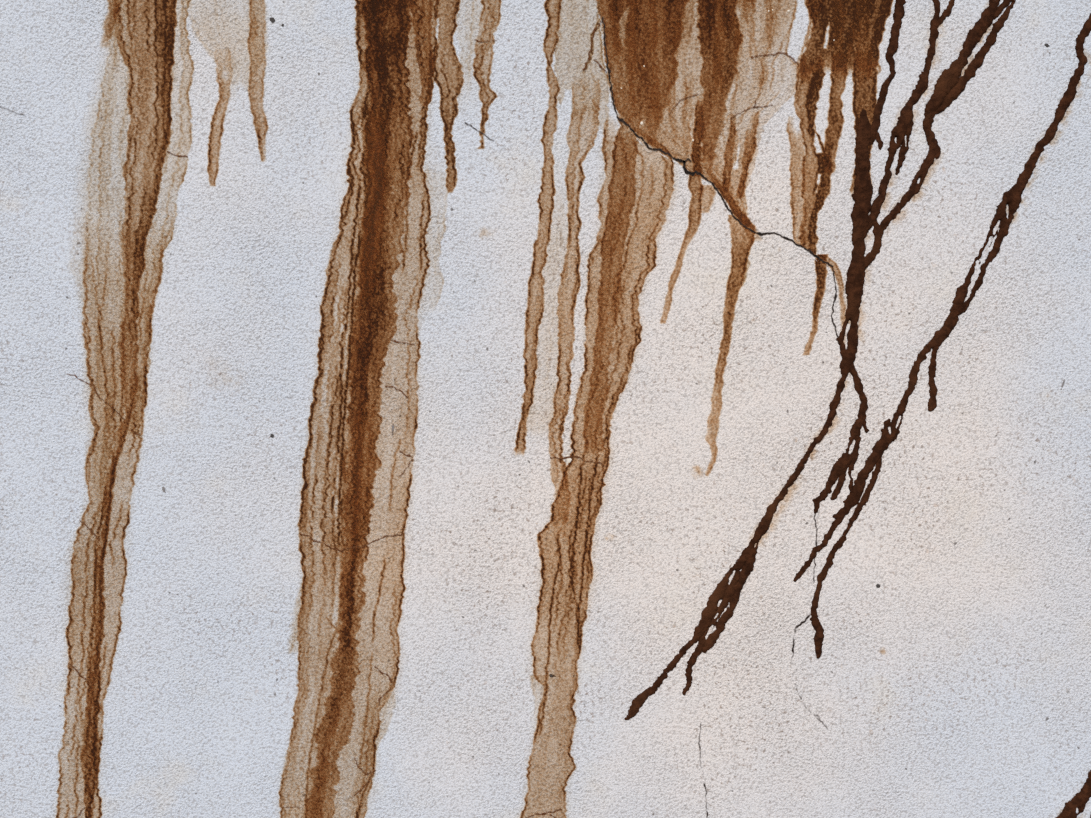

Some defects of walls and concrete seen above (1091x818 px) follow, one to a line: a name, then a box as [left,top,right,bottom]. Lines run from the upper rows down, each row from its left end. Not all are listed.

rust [65,0,176,818]
rust [298,0,496,818]
rust [516,0,664,740]
rust [586,0,758,378]
crack [583,17,839,338]
rust [791,0,893,321]